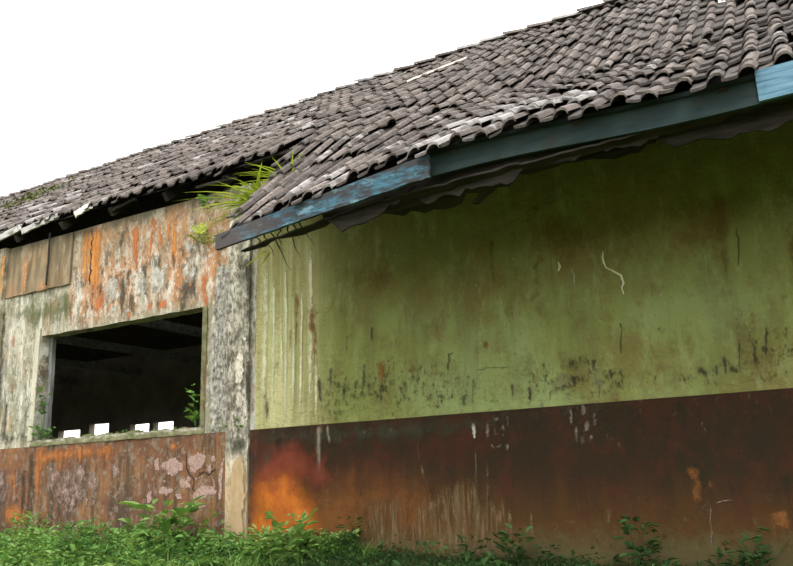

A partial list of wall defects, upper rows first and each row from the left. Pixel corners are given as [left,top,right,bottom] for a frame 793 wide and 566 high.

corrosion [83,230,103,310]
corrosion [149,218,177,258]
water stain [206,263,229,432]
water stain [528,358,596,401]
spalling [146,452,246,542]
corrosion [251,470,313,546]